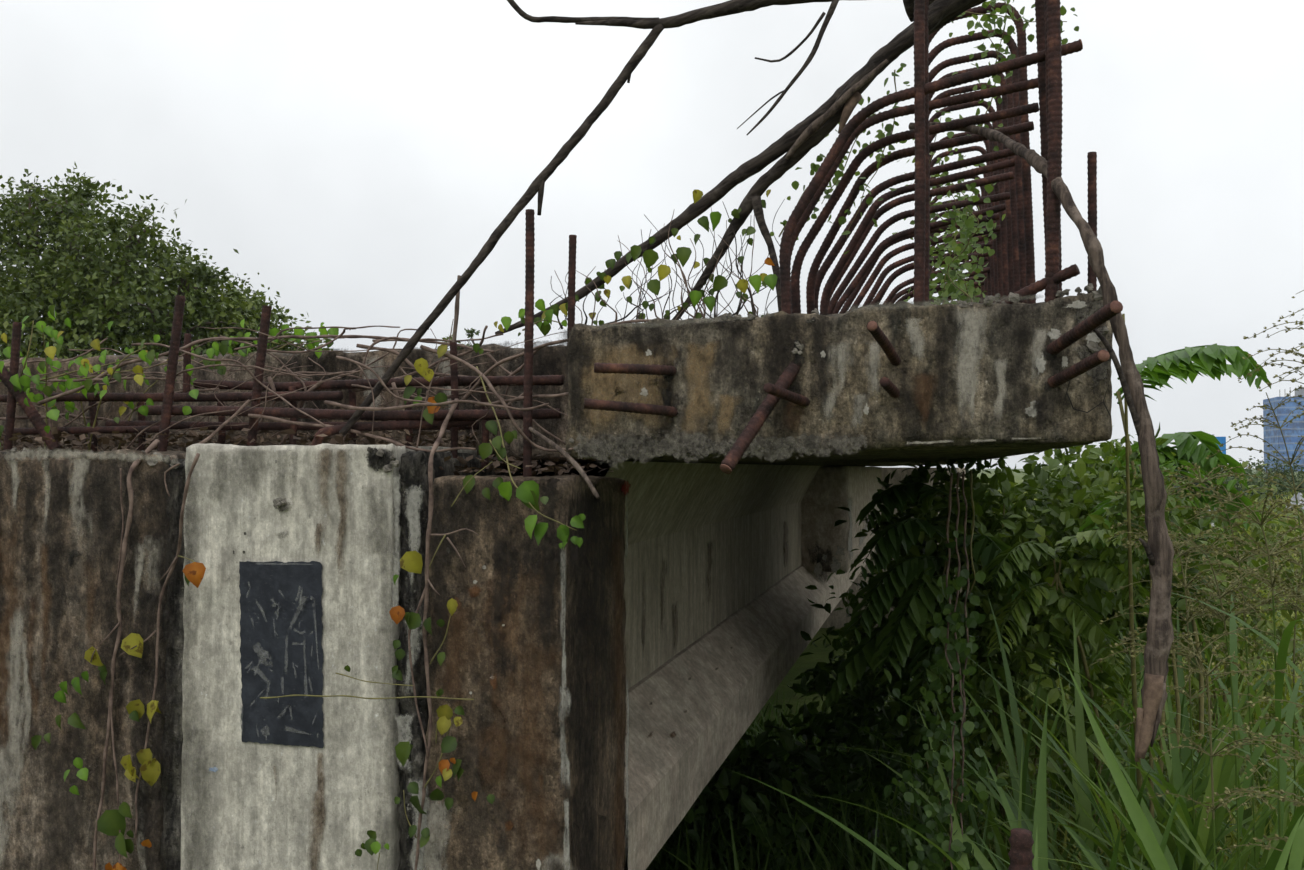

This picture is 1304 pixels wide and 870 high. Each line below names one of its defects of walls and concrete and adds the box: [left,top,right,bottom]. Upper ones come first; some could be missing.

damp [278,342,511,440]
damp [533,313,880,442]
spalling [569,375,867,466]
damp [901,304,1063,431]
damp [0,456,210,870]
damp [368,475,629,870]